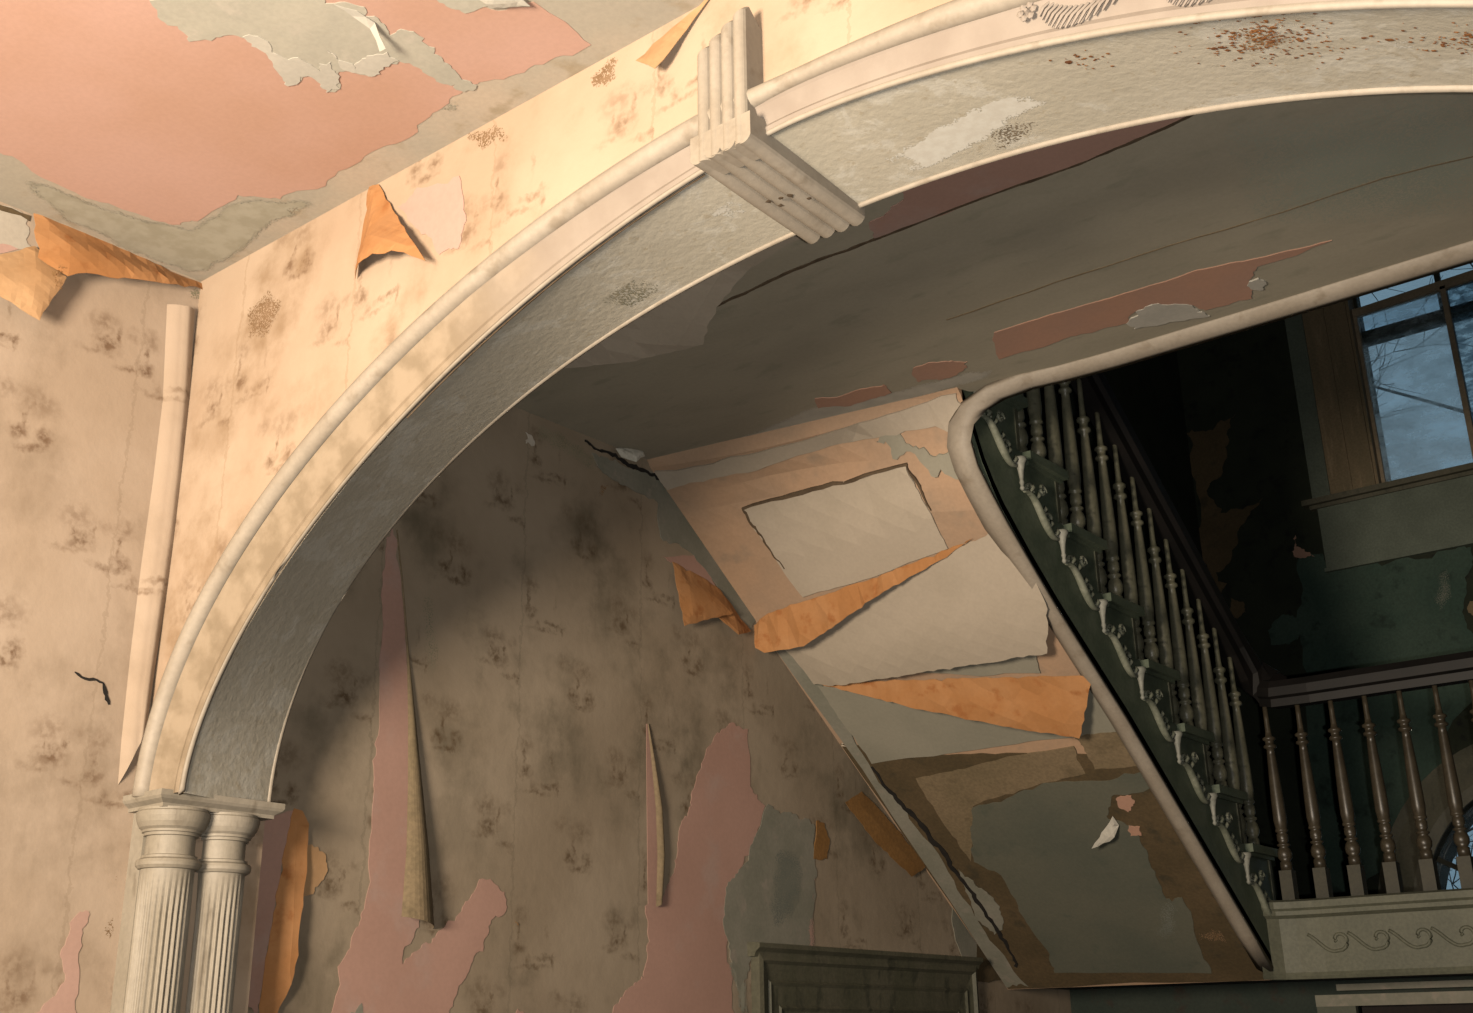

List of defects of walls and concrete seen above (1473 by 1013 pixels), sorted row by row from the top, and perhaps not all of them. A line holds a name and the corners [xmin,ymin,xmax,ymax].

flaking render [0,0,591,225]
corrosion [1174,13,1473,69]
flaking render [0,205,31,254]
flaking render [398,176,467,255]
flaking render [992,240,1332,359]
crack [946,156,1473,320]
peeling [592,361,967,630]
peeling [1187,414,1262,619]
crack [75,672,110,705]
flaking render [332,528,507,1013]
flaking render [613,722,765,1013]
peeling [777,650,1264,989]